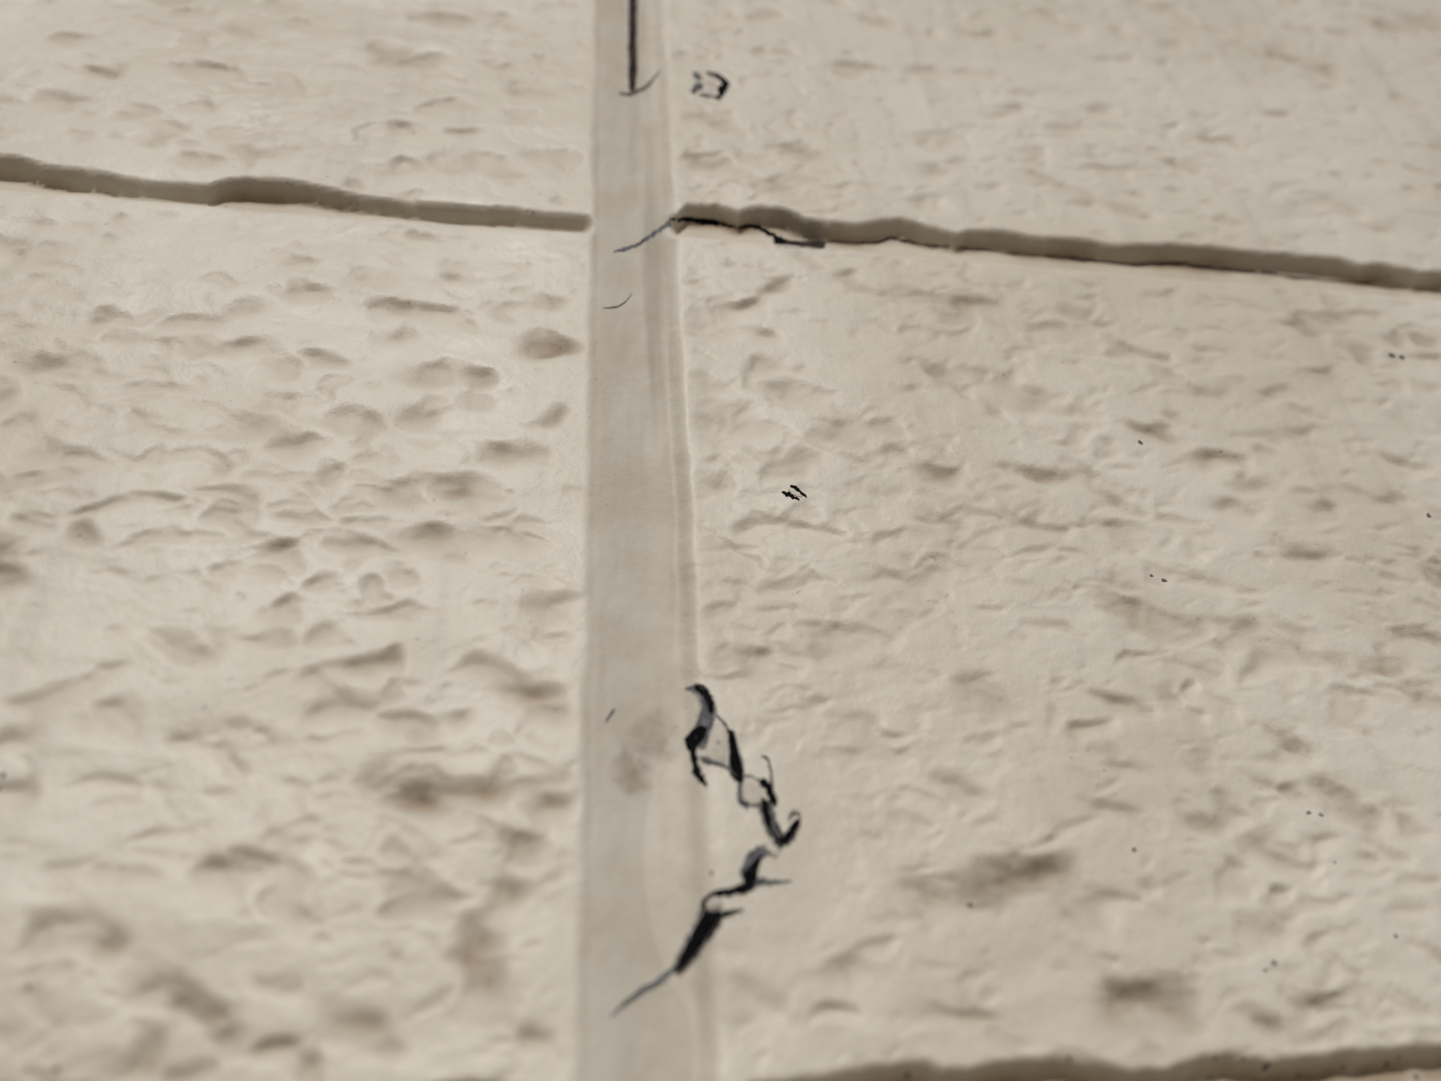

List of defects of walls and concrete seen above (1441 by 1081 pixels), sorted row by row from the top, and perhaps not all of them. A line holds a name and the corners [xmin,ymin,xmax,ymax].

crack [619,70,660,96]
crack [614,217,1441,293]
crack [611,683,801,1017]